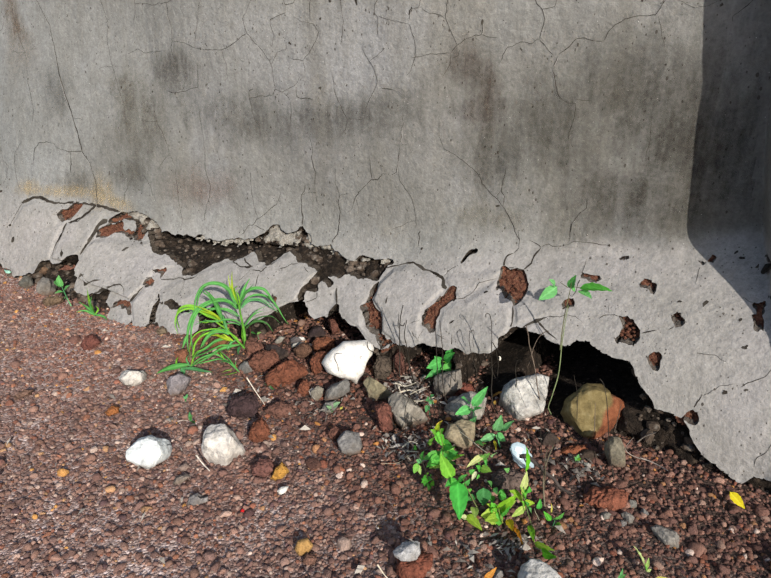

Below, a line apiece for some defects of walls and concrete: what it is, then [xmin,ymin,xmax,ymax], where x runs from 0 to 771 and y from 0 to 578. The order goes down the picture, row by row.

crack [0,0,713,326]
spalling [96,211,159,244]
spalling [196,225,371,263]
spalling [496,266,529,306]
spalling [639,278,657,294]
spalling [360,276,397,353]
spalling [422,286,457,333]
crack [510,307,581,340]
spalling [615,316,640,346]
spalling [752,295,771,332]
spalling [646,352,662,371]
crack [694,370,771,407]